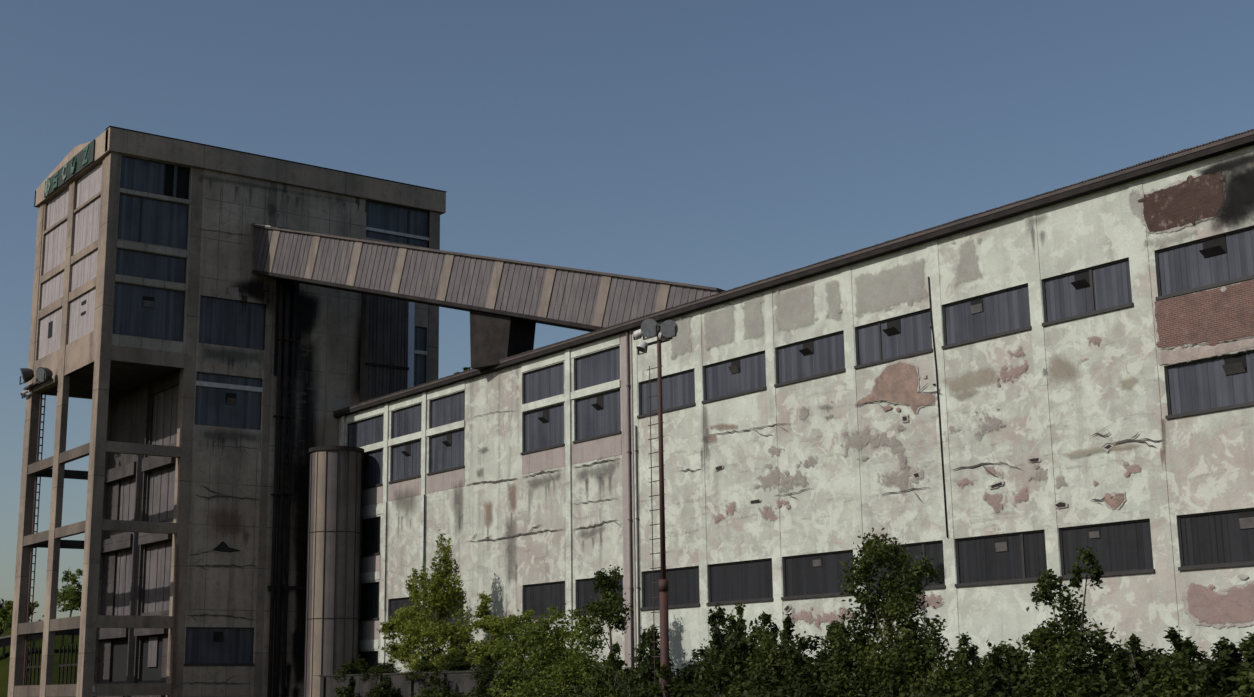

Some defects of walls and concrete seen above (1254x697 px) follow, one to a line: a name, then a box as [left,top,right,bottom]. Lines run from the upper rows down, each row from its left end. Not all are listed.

flaking render [1129,171,1226,246]
leakage [1200,153,1254,224]
leakage [297,295,316,355]
flaking render [1152,279,1254,364]
flaking render [843,359,937,496]
crack [1091,425,1163,447]
peeling [713,446,818,523]
crack [883,462,1020,502]
flaking render [1182,574,1254,629]